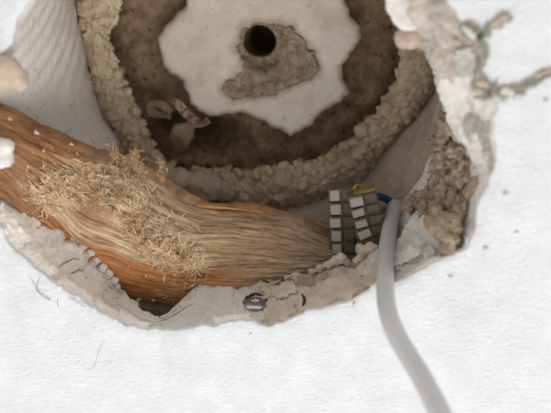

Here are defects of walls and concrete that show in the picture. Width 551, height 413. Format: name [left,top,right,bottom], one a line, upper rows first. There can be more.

flaking render [2,0,36,56]
spalling [222,22,319,100]
crack [461,12,512,58]
crack [470,69,551,101]
flaking render [385,0,498,281]
flaking render [0,198,379,329]